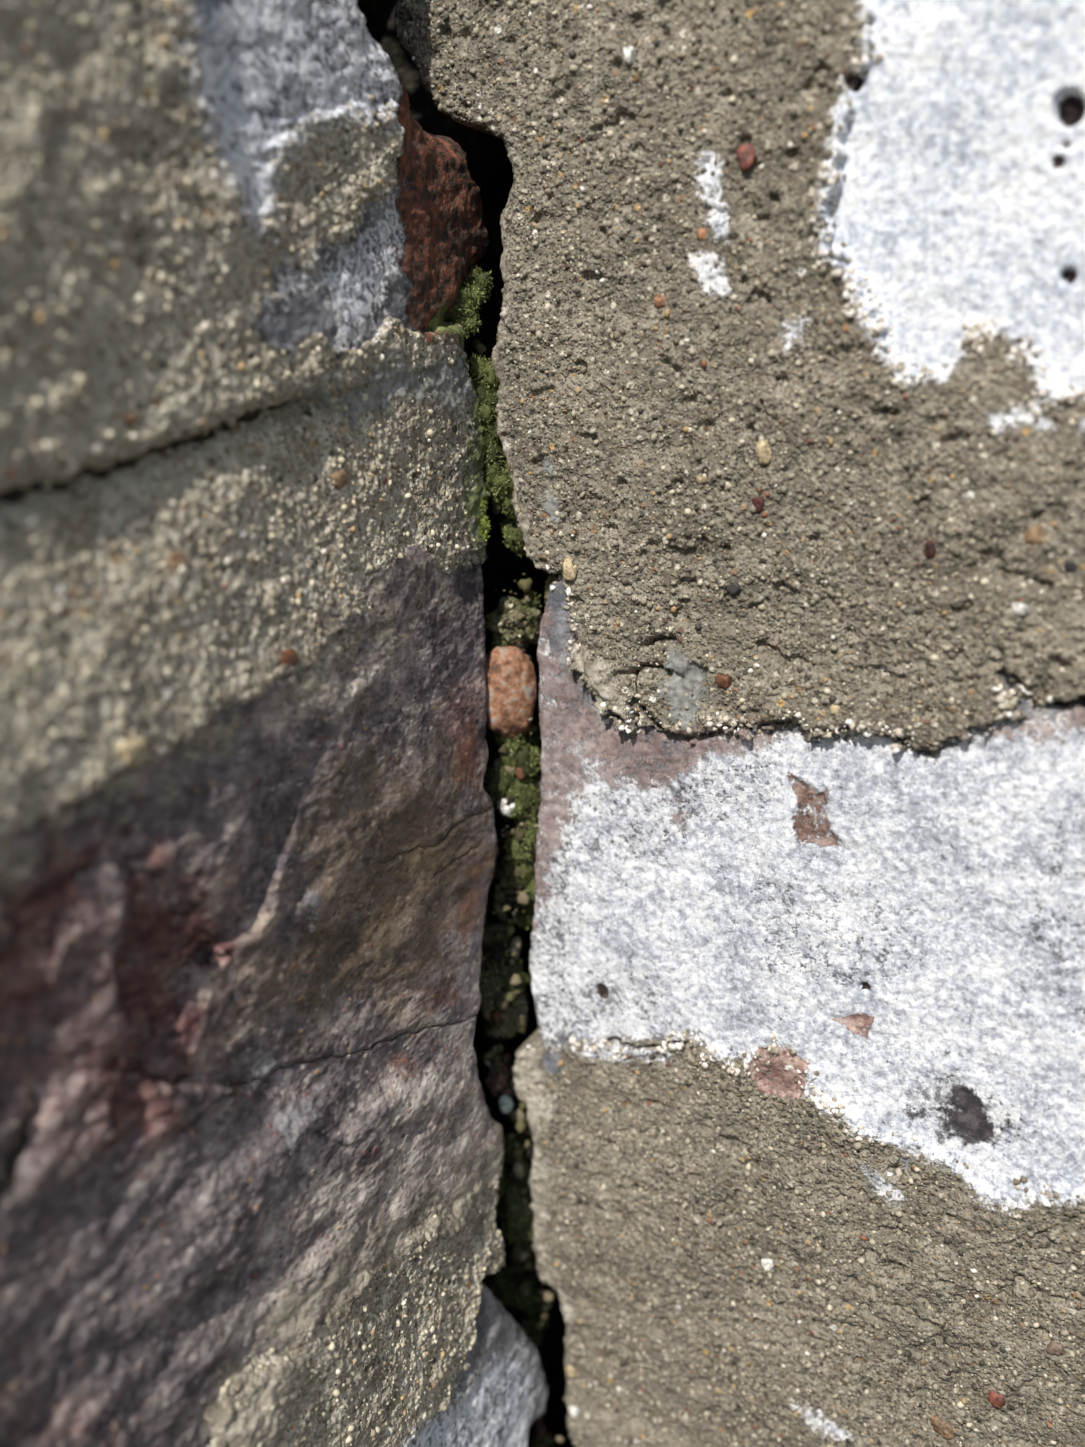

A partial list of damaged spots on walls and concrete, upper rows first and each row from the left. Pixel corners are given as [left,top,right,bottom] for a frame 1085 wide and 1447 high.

crack [357,0,514,382]
peeling [687,144,756,299]
peeling [813,0,1085,436]
peeling [778,316,811,352]
crack [0,400,300,505]
crack [481,491,548,724]
crack [577,636,931,753]
peeling [529,618,1085,1217]
crack [133,726,575,1447]
crack [588,1036,680,1049]
peeling [790,1403,860,1442]